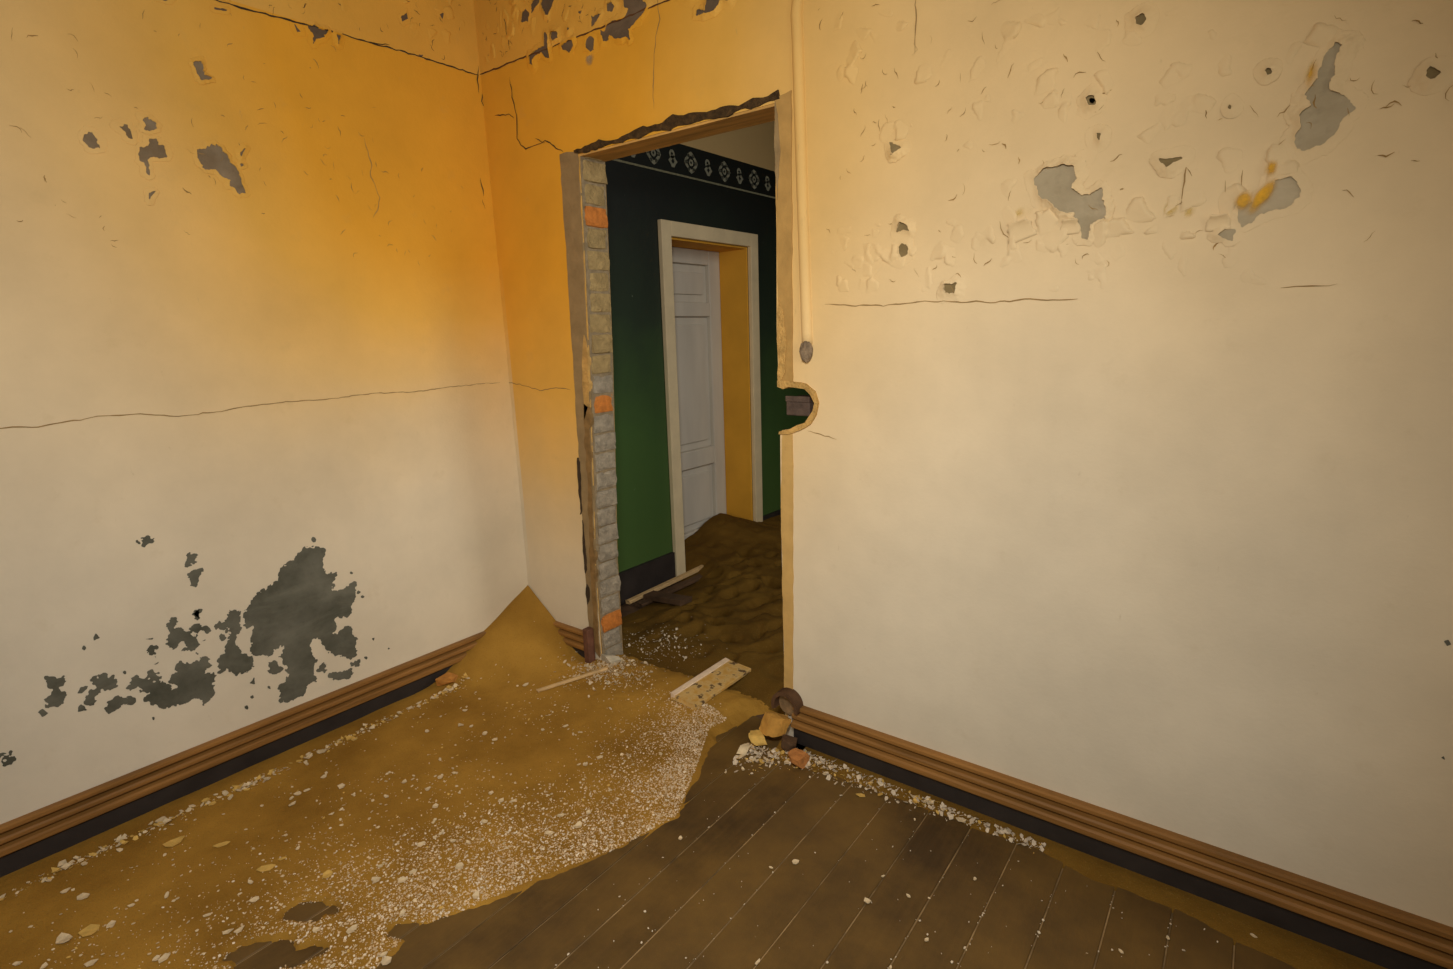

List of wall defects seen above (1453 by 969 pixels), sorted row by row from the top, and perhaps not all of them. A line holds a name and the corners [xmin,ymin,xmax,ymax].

peeling [518,0,653,74]
peeling [78,110,173,206]
peeling [192,139,251,198]
crack [183,0,670,266]
peeling [1007,83,1115,246]
peeling [1205,29,1369,247]
crack [1205,60,1406,145]
peeling [936,273,970,304]
crack [0,382,570,429]
peeling [136,535,154,547]
peeling [38,537,390,720]
peeling [0,750,16,767]